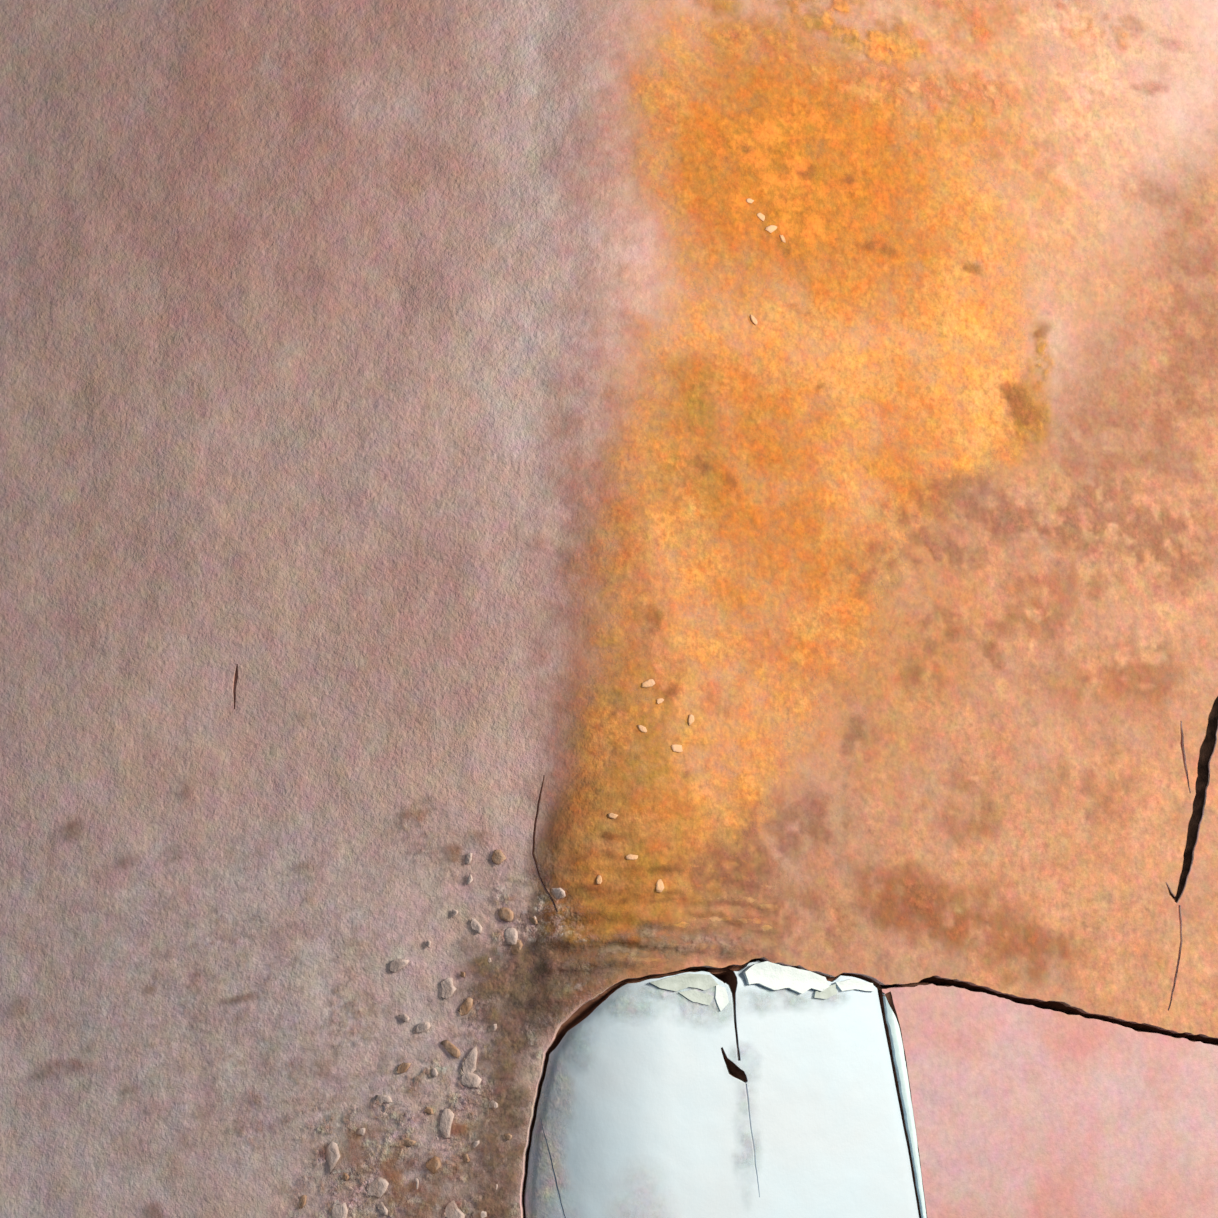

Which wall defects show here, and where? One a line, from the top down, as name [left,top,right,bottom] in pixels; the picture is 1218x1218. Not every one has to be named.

flaking render [746,198,786,243]
rust [551,0,1178,946]
flaking render [641,679,664,704]
crack [532,775,556,906]
crack [1167,696,1218,985]
flaking render [277,849,874,1218]
crack [522,958,1218,1218]